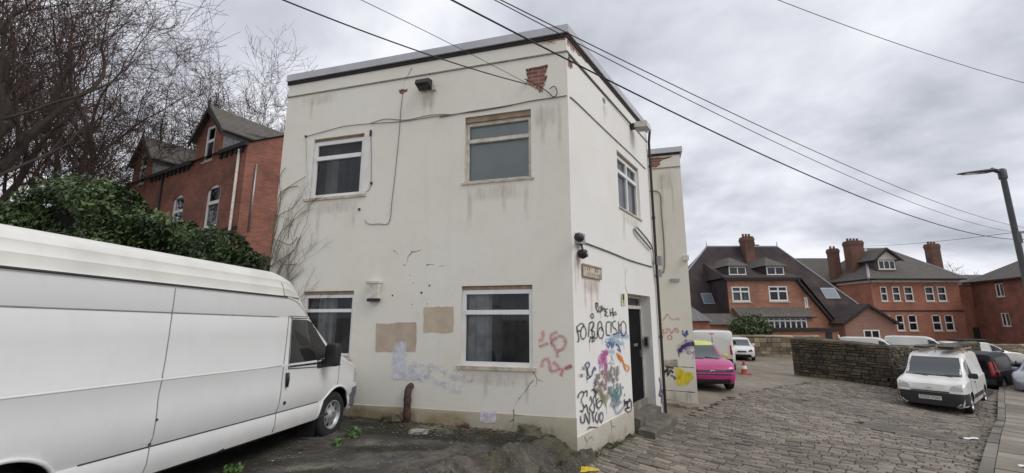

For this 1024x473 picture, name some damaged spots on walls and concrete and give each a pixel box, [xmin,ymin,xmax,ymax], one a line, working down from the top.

spalling [526,65,548,93]
spalling [651,156,672,168]
crack [510,372,543,427]